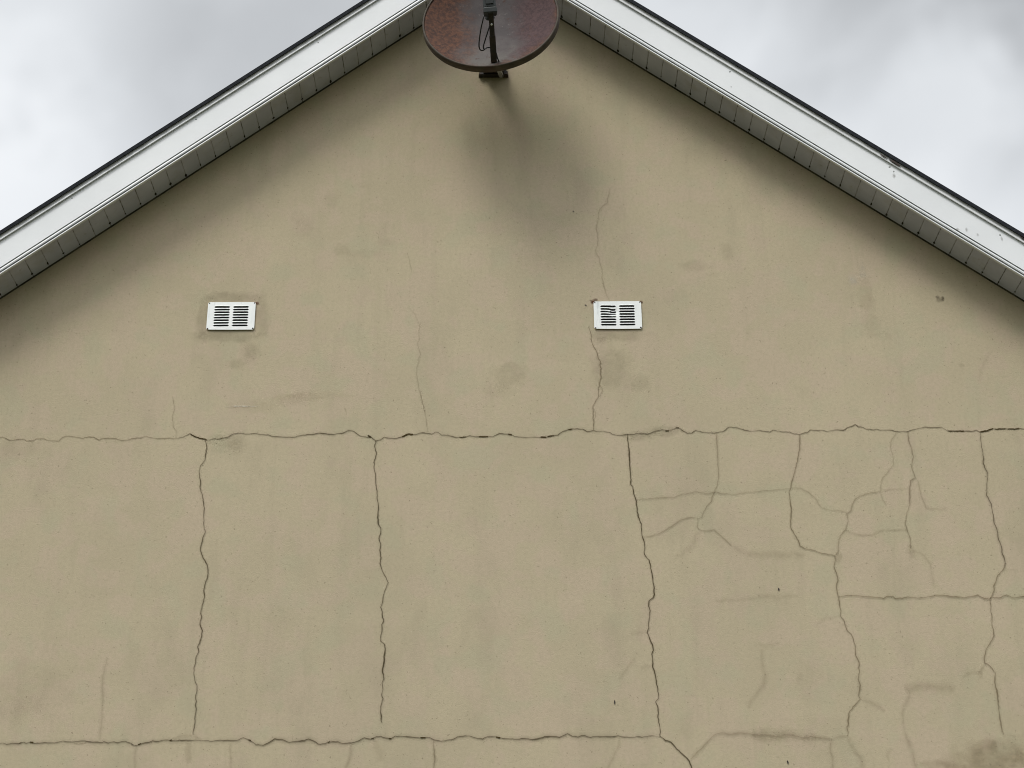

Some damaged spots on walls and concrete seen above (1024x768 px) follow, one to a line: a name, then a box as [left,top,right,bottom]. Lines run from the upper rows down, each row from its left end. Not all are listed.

crack [4,340,1022,768]